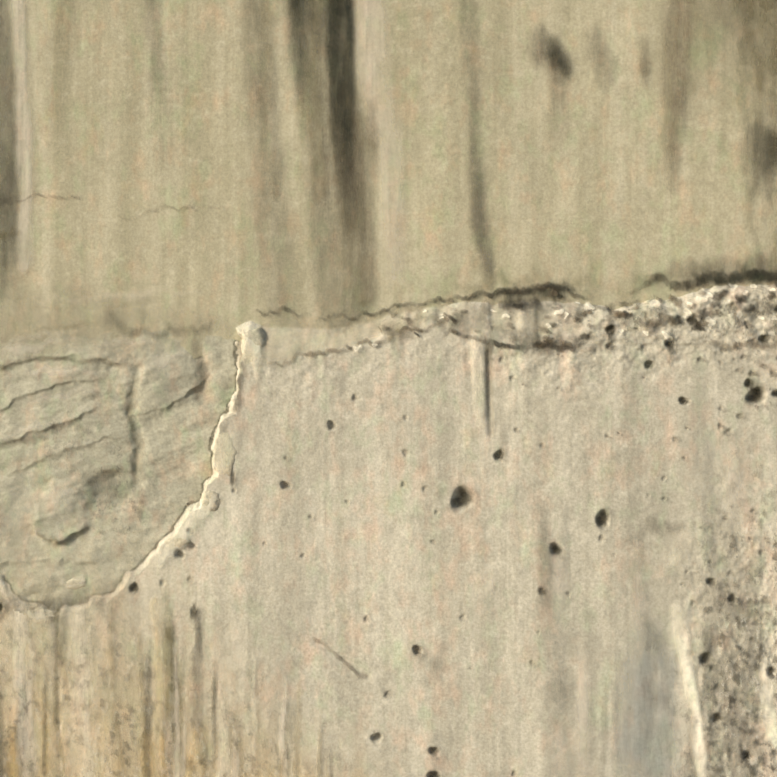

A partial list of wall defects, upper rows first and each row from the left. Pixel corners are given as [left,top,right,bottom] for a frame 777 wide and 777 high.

leakage [0,0,31,271]
leakage [290,0,377,187]
leakage [537,34,568,71]
peeling [684,292,713,322]
spalling [0,324,265,624]
leakage [154,617,175,721]